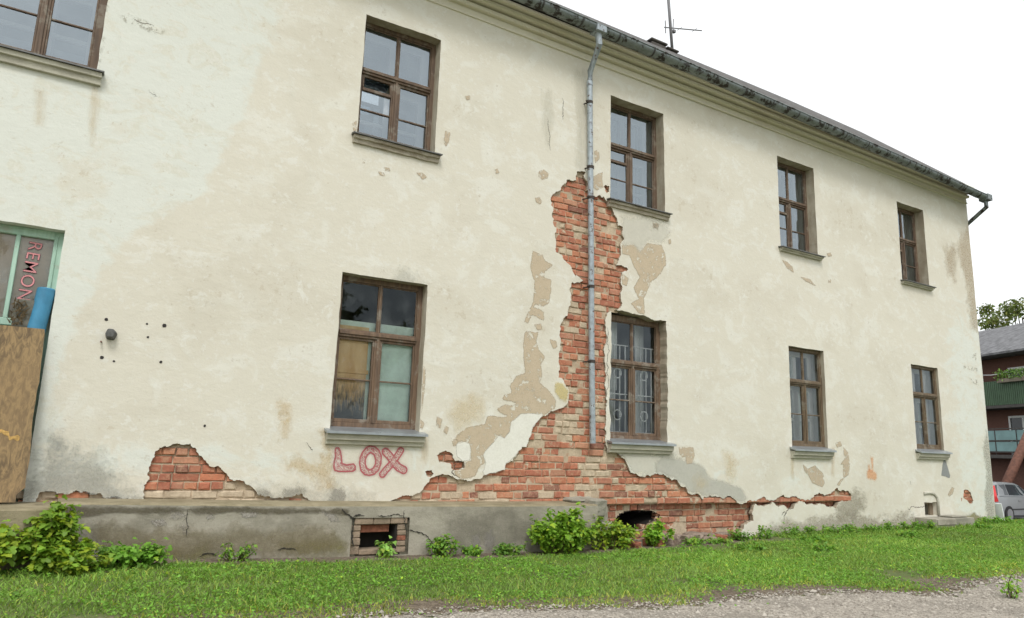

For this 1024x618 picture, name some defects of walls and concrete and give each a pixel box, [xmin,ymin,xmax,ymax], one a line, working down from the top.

flaking render [391,150,851,539]
flaking render [143,443,308,518]
flaking render [948,487,973,503]